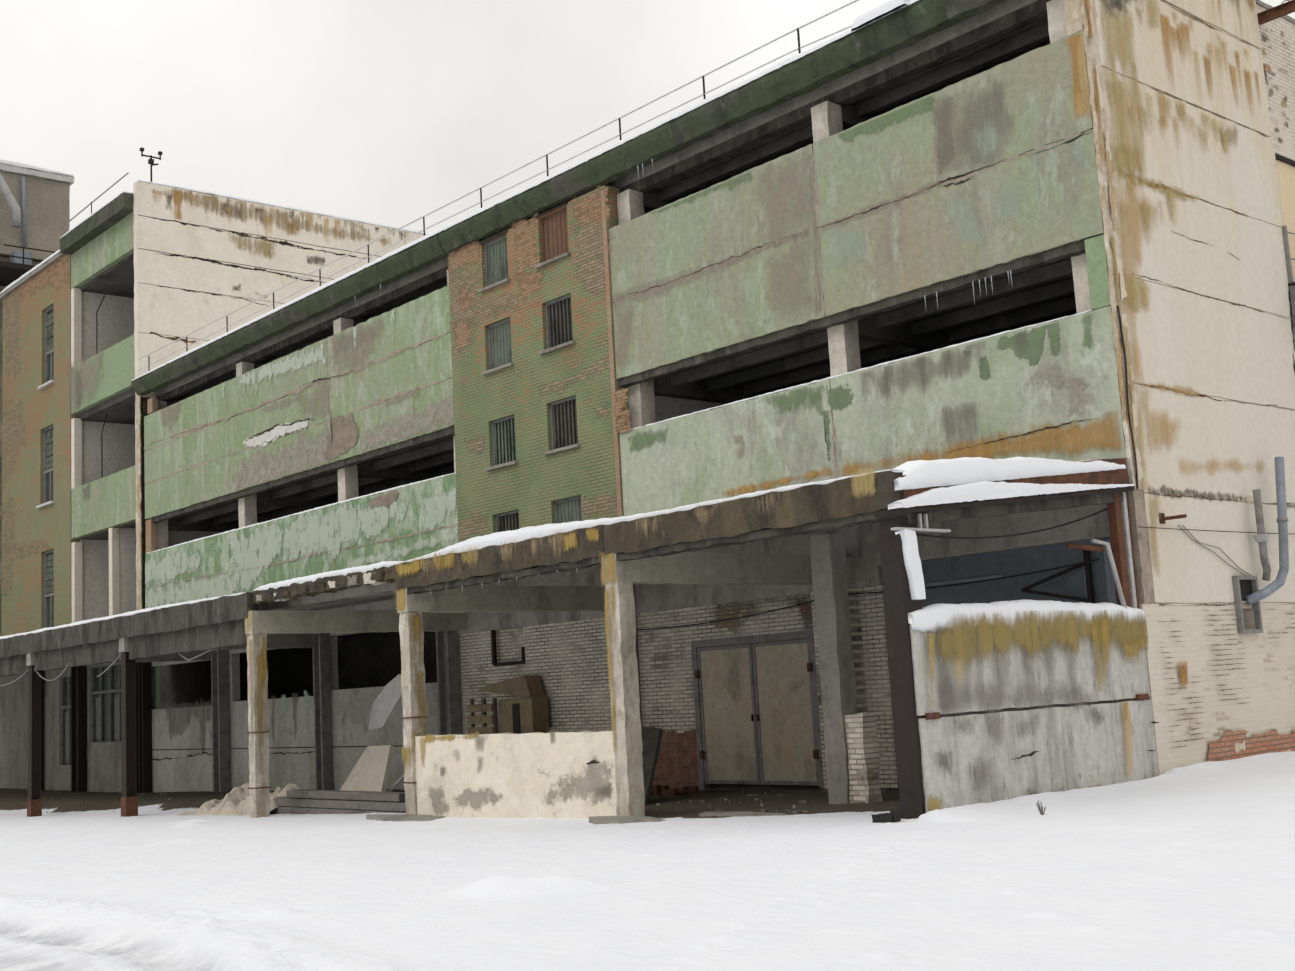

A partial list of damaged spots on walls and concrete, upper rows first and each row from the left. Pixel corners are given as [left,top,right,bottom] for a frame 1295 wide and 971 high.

rust [1197,44,1259,94]
crack [1119,170,1247,216]
crack [151,217,371,306]
crack [1130,273,1295,371]
crack [1137,383,1290,409]
spalling [233,395,454,491]
rust [904,412,1119,462]
spalling [367,490,398,509]
rust [727,461,888,503]
spalling [252,565,396,605]
leakage [928,610,1148,741]
flaking render [1207,729,1295,762]